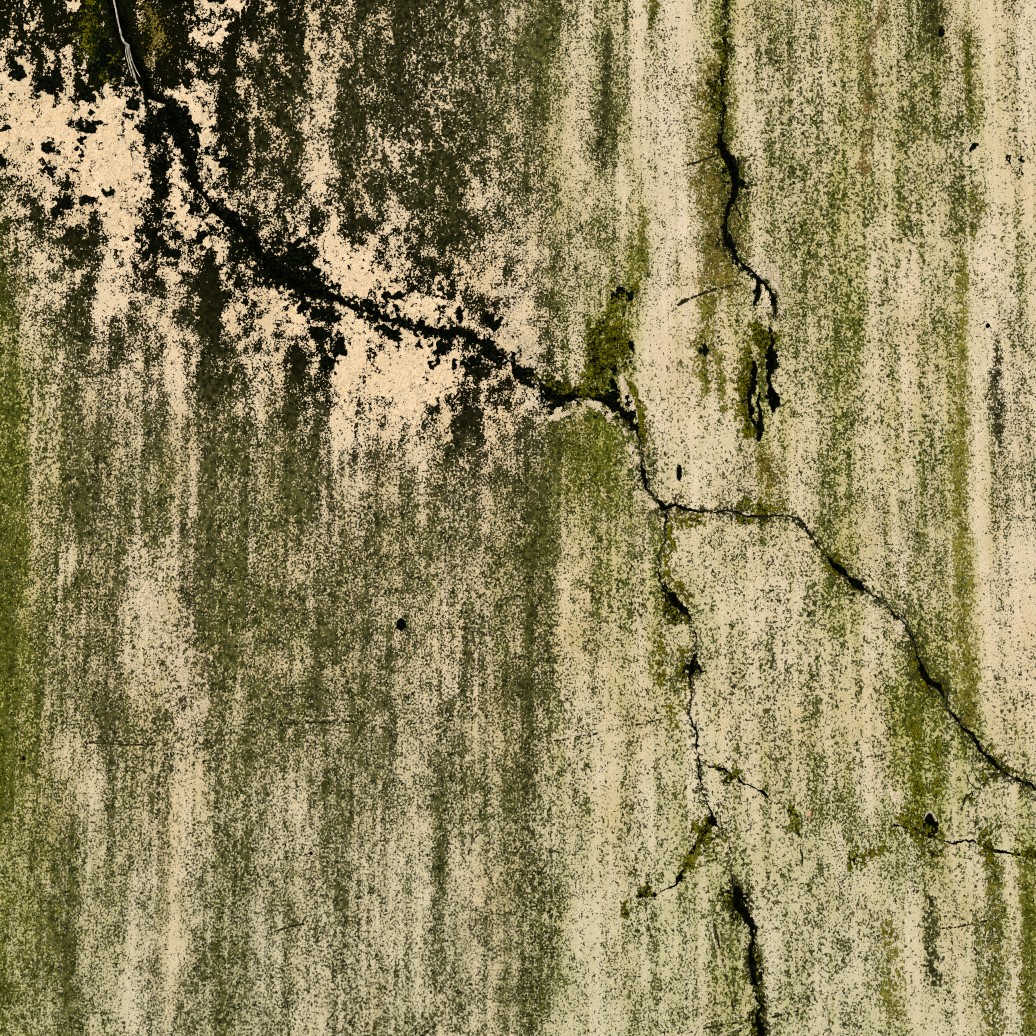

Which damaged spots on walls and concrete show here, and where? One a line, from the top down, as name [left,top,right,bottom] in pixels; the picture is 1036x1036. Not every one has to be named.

leakage [5,57,103,177]
leakage [52,186,115,217]
leakage [678,50,755,416]
crack [69,0,1036,800]
leakage [937,253,1013,730]
leakage [492,403,625,1036]
crack [620,898,635,922]
crack [634,629,781,1036]
crack [784,802,808,867]
crack [847,808,1036,874]
crack [960,775,975,810]
leakage [974,856,1036,1036]